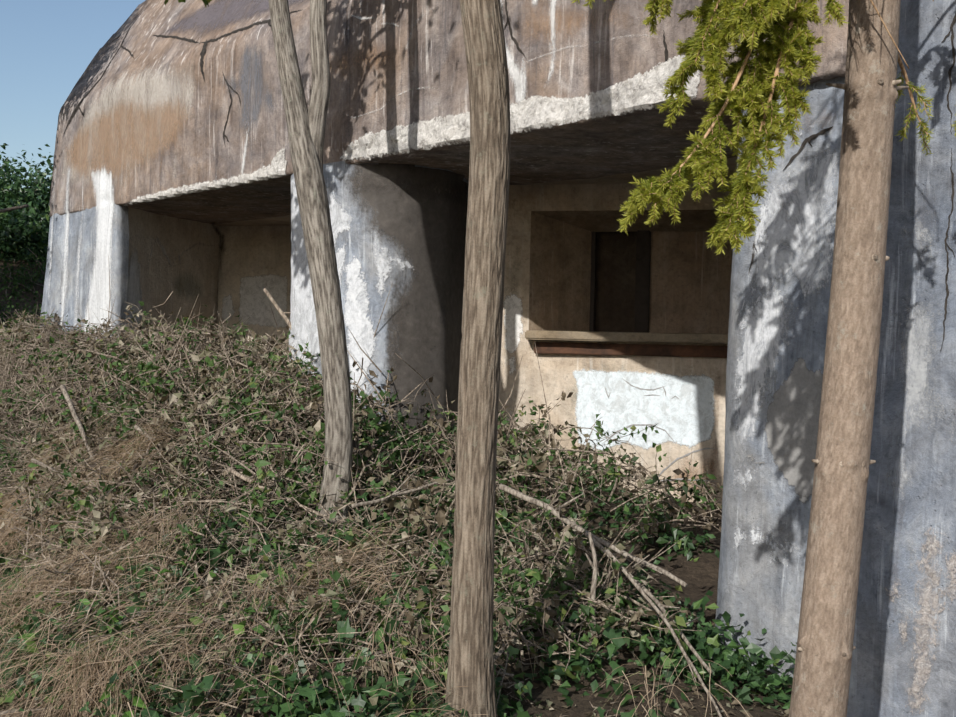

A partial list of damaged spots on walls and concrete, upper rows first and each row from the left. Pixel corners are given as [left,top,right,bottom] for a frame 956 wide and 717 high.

crack [62,24,133,138]
crack [153,10,300,144]
crack [783,127,832,170]
crack [940,13,956,351]
damp [348,155,468,456]
peeling [735,358,823,503]